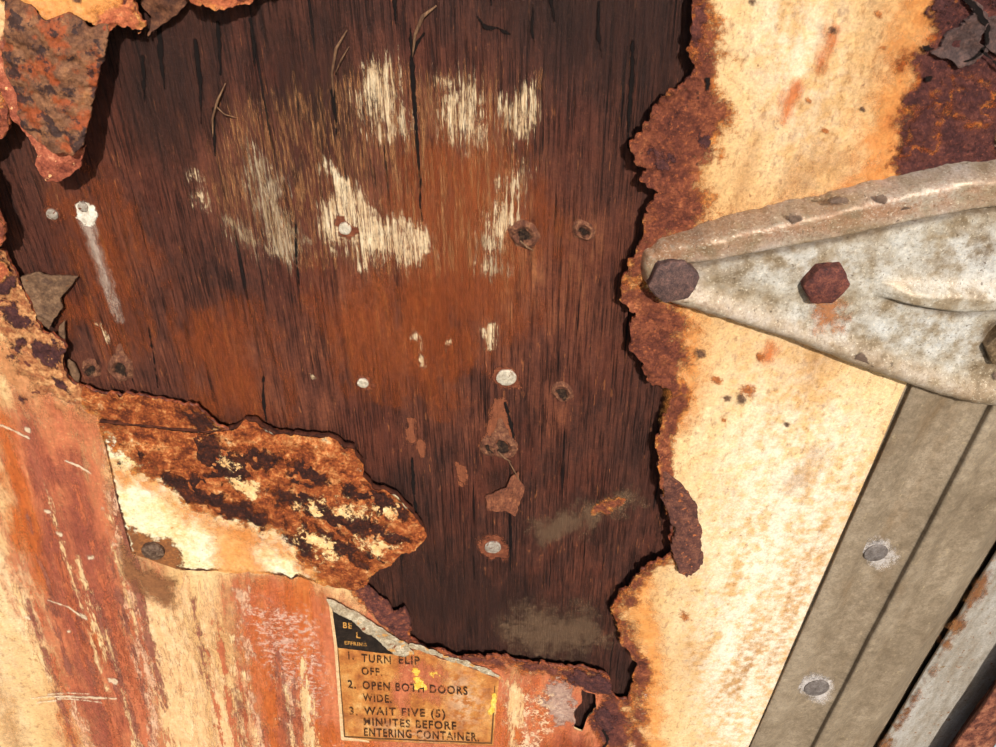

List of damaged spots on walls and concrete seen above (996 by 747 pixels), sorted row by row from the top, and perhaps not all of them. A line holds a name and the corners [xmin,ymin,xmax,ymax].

peeling [0,0,109,182]
corrosion [784,82,811,117]
corrosion [861,0,996,181]
corrosion [807,299,850,331]
corrosion [0,0,737,747]
corrosion [724,385,756,404]
peeling [406,417,426,458]
spalling [485,440,509,454]
peeling [455,461,469,487]
peeling [591,497,625,515]
peeling [103,485,333,747]
corrosion [940,574,988,655]